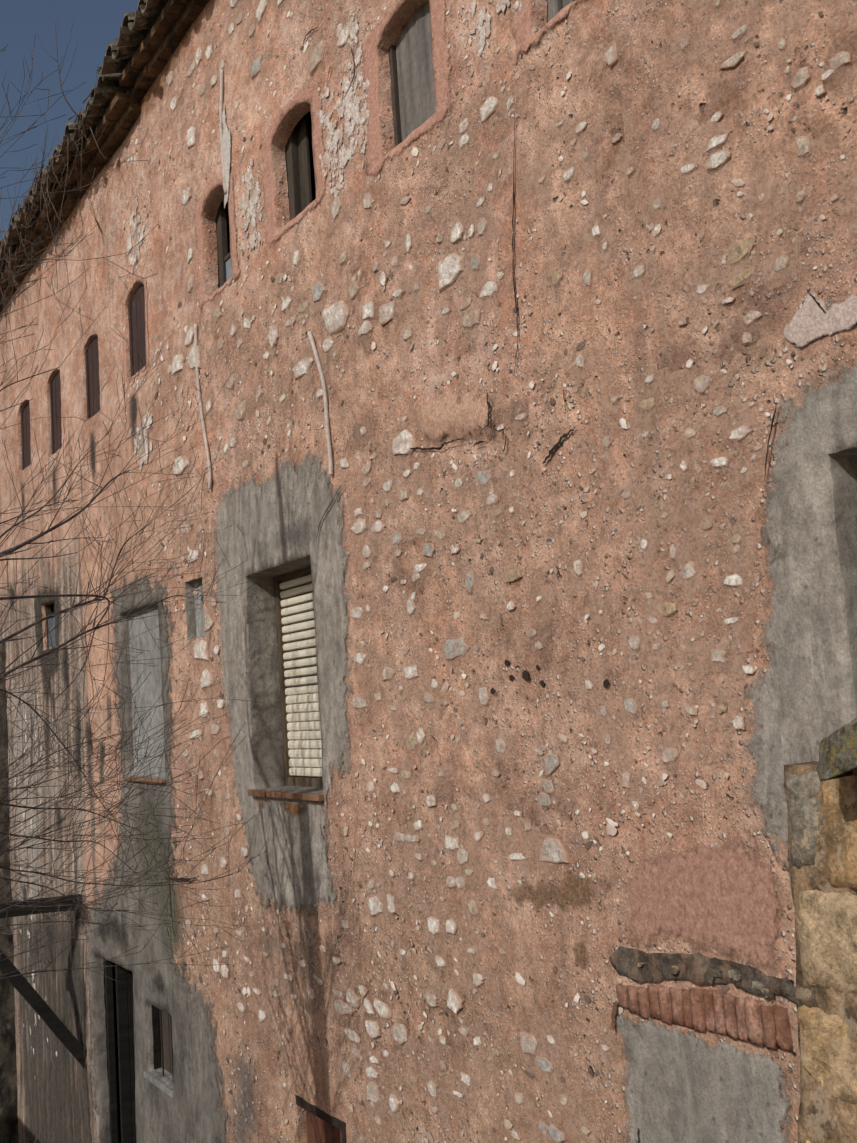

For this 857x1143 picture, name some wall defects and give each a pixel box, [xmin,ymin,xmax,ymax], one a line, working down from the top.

flaking render [588,32,623,76]
flaking render [781,51,852,97]
flaking render [611,109,684,176]
flaking render [634,0,757,233]
flaking render [795,132,827,158]
crack [511,122,519,371]
flaking render [659,166,810,349]
flaking render [783,292,857,347]
crack [409,392,507,452]
crack [542,390,575,464]